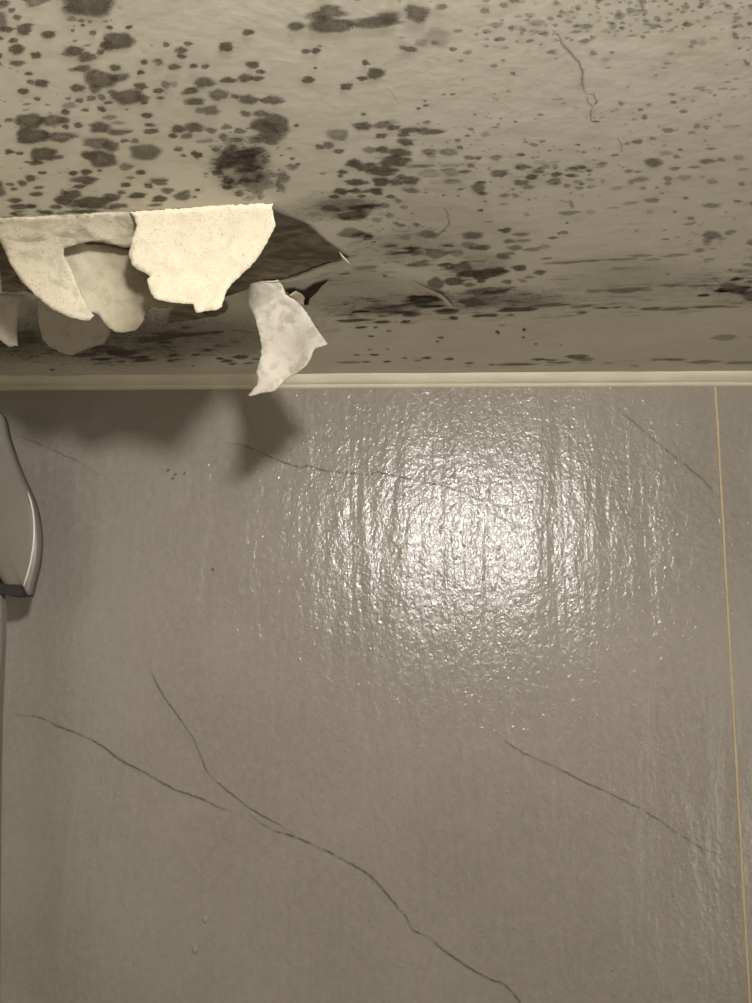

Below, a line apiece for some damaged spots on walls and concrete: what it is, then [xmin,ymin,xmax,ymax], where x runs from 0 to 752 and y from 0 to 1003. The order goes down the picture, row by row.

damp [288,4,447,33]
damp [0,0,300,216]
damp [341,60,385,90]
damp [316,112,543,237]
damp [0,308,258,371]
peeling [0,203,354,396]
damp [336,306,421,337]
damp [428,228,563,320]